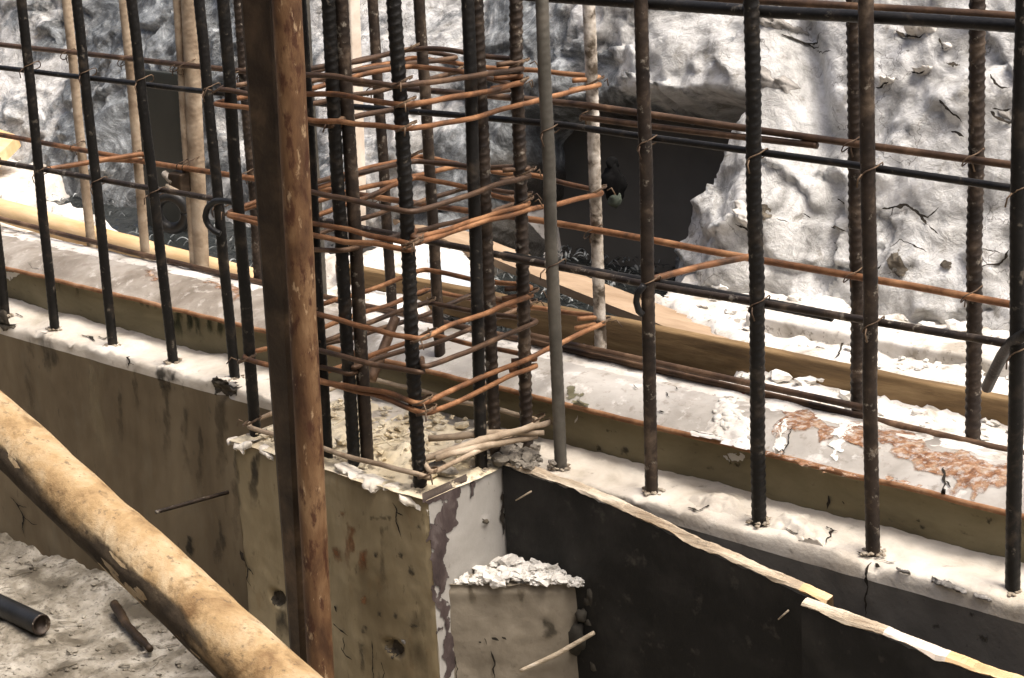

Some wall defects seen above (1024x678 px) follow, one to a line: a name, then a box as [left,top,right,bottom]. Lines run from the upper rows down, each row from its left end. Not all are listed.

crack [882,203,939,252]
crack [982,248,1009,267]
spalling [302,0,1024,678]
water stain [156,368,174,405]
corrosion [772,409,864,448]
water stain [250,455,258,490]
corrosion [767,451,858,477]
corrosion [878,430,1007,501]
crack [857,551,896,615]